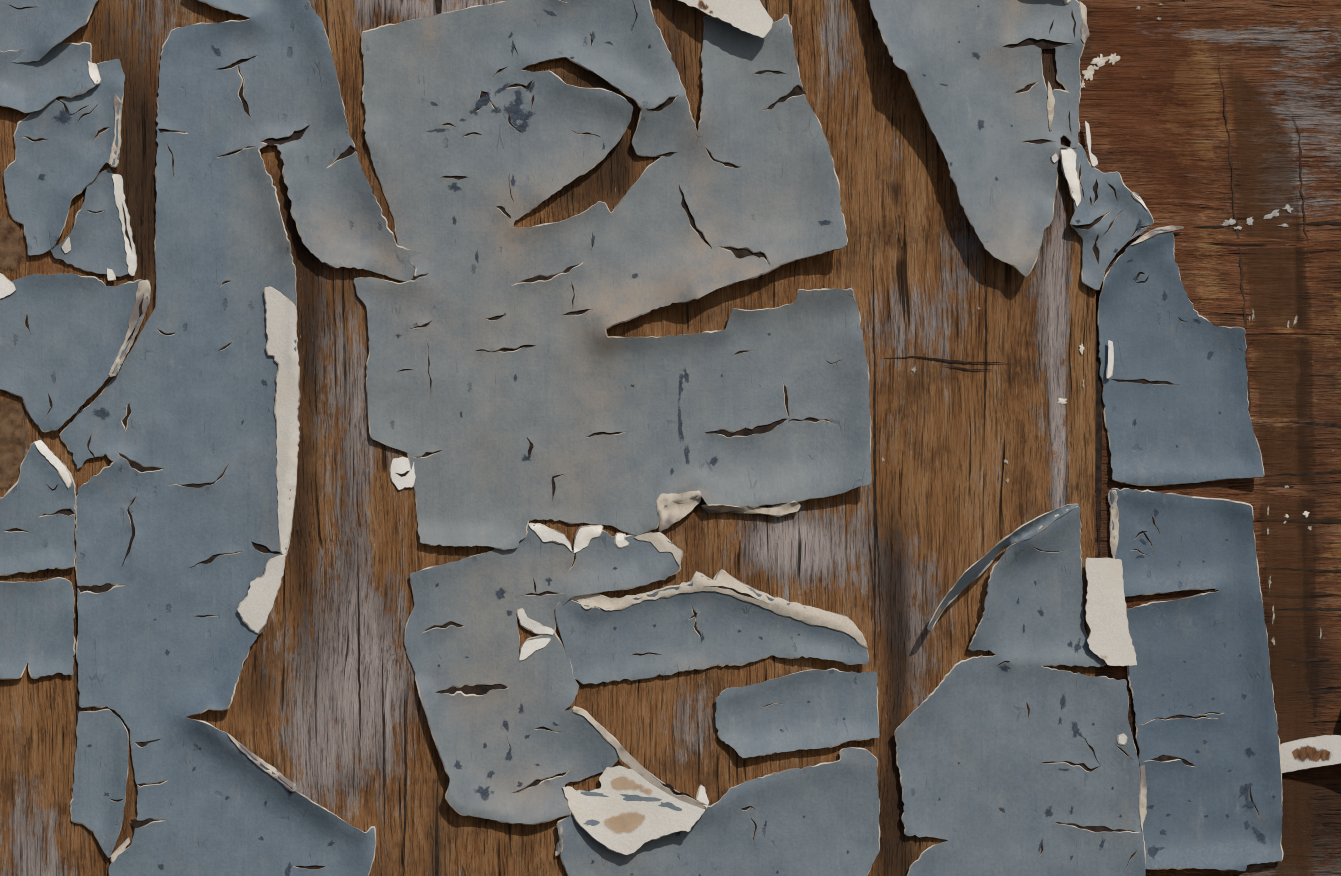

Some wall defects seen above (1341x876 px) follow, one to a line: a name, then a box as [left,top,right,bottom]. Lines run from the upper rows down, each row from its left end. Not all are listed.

peeling [0,0,880,876]
peeling [869,0,1341,876]